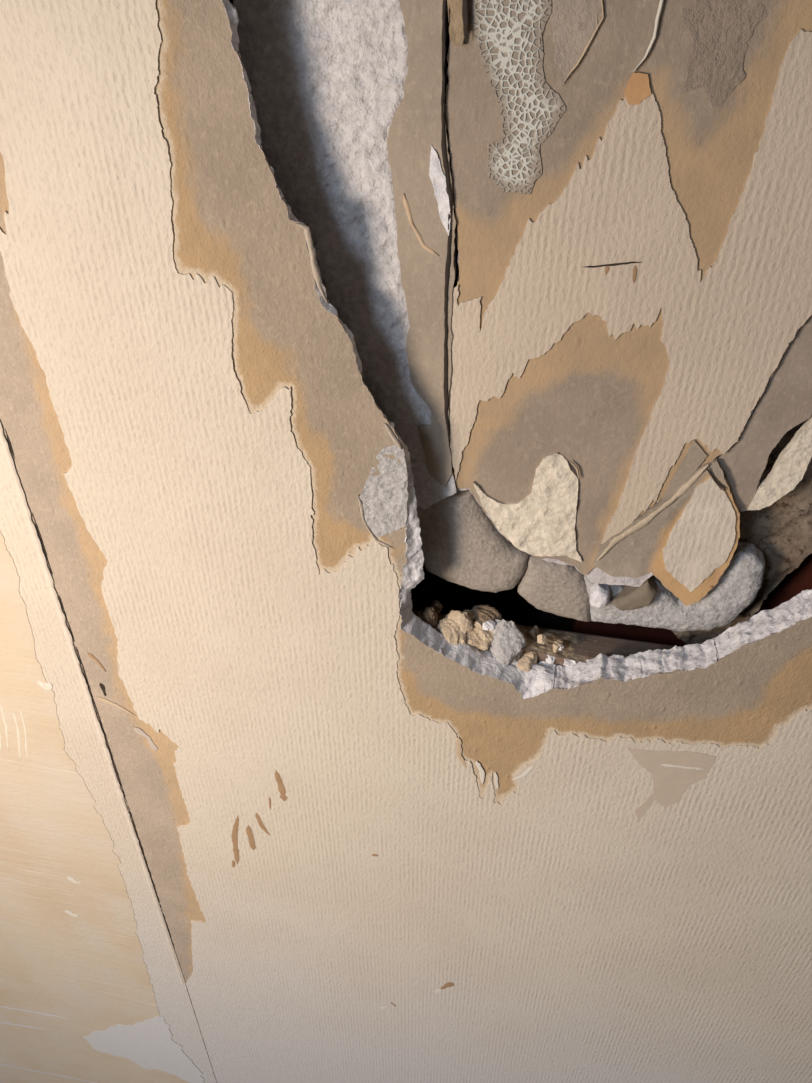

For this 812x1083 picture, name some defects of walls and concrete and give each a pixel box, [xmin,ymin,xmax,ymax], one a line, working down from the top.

peeling [0,152,9,233]
peeling [0,252,206,982]
crack [0,423,217,1083]
spalling [231,771,288,868]
water stain [456,737,499,789]
peeling [155,0,812,821]